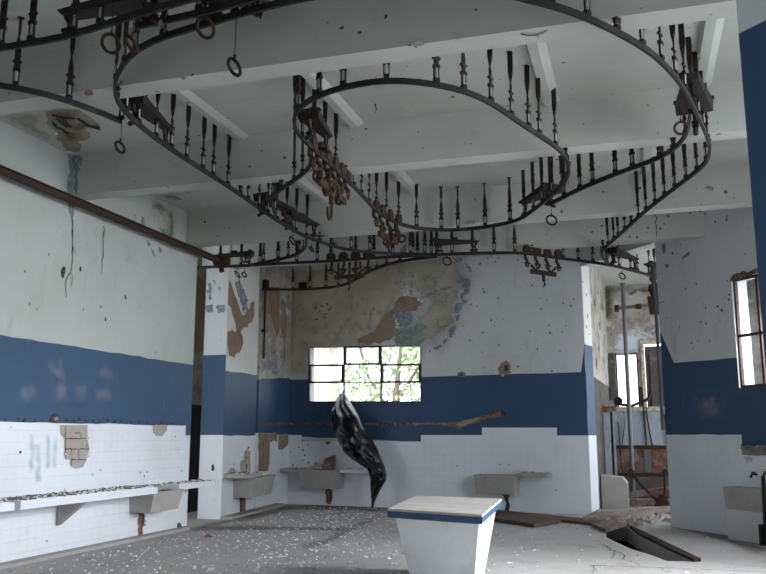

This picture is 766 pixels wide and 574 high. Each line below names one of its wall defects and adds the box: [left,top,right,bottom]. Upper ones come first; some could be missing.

crack [65,219,76,297]
flaking render [205,280,287,375]
flaking render [358,255,496,349]
flaking render [497,361,519,376]
peeling [60,418,182,469]
flaking render [228,432,289,473]
peeling [740,444,766,456]